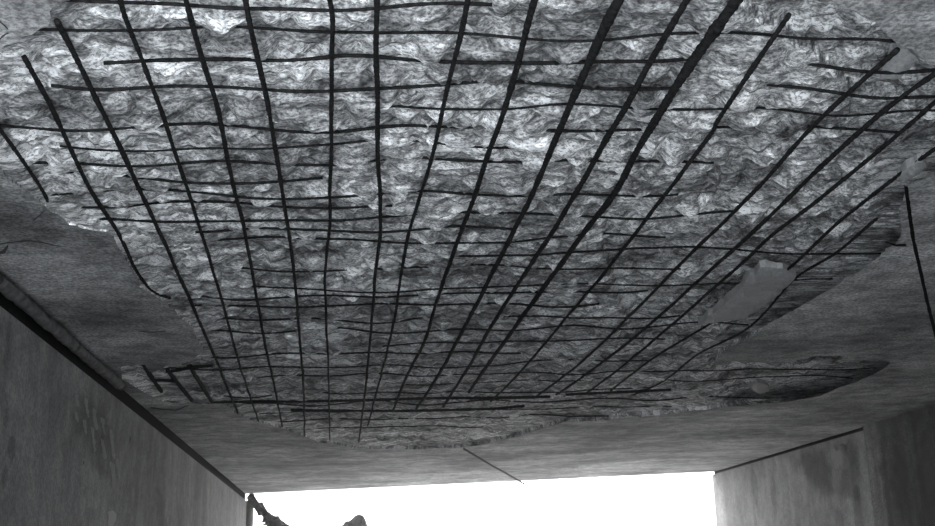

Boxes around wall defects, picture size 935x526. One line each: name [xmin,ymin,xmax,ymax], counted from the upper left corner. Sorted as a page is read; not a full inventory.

crack [885,186,935,337]
spalling [393,305,433,332]
spalling [431,305,473,330]
spalling [466,294,509,329]
spalling [569,285,656,317]
spalling [327,305,372,367]
spalling [383,354,417,375]
spalling [414,343,454,367]
spalling [608,323,713,392]
spalling [402,376,436,393]
spalling [427,367,467,397]
spalling [451,373,517,397]